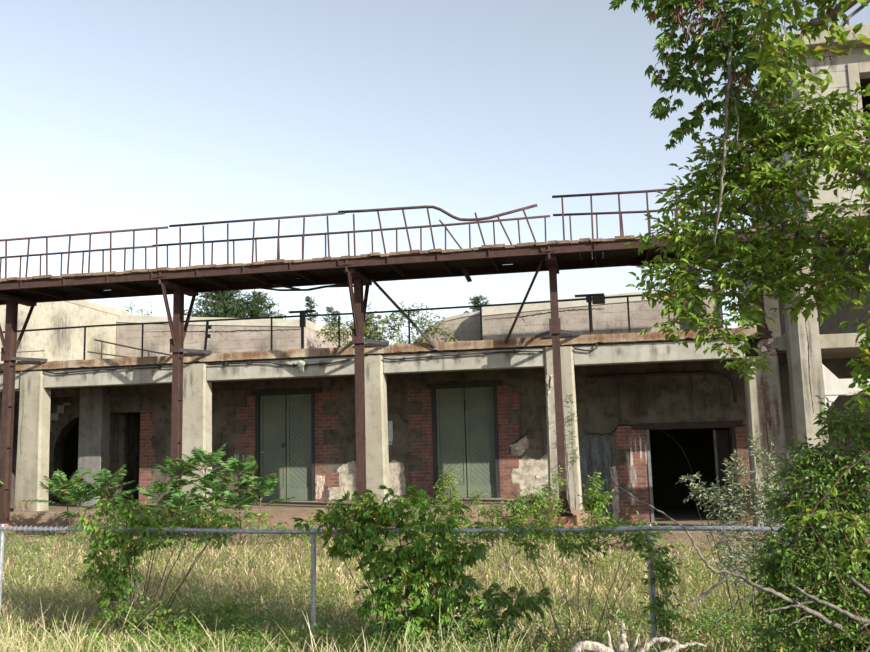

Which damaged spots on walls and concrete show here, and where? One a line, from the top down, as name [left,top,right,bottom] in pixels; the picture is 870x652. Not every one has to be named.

rust [756,378,780,466]
spalling [315,460,356,501]
spalling [509,435,549,496]